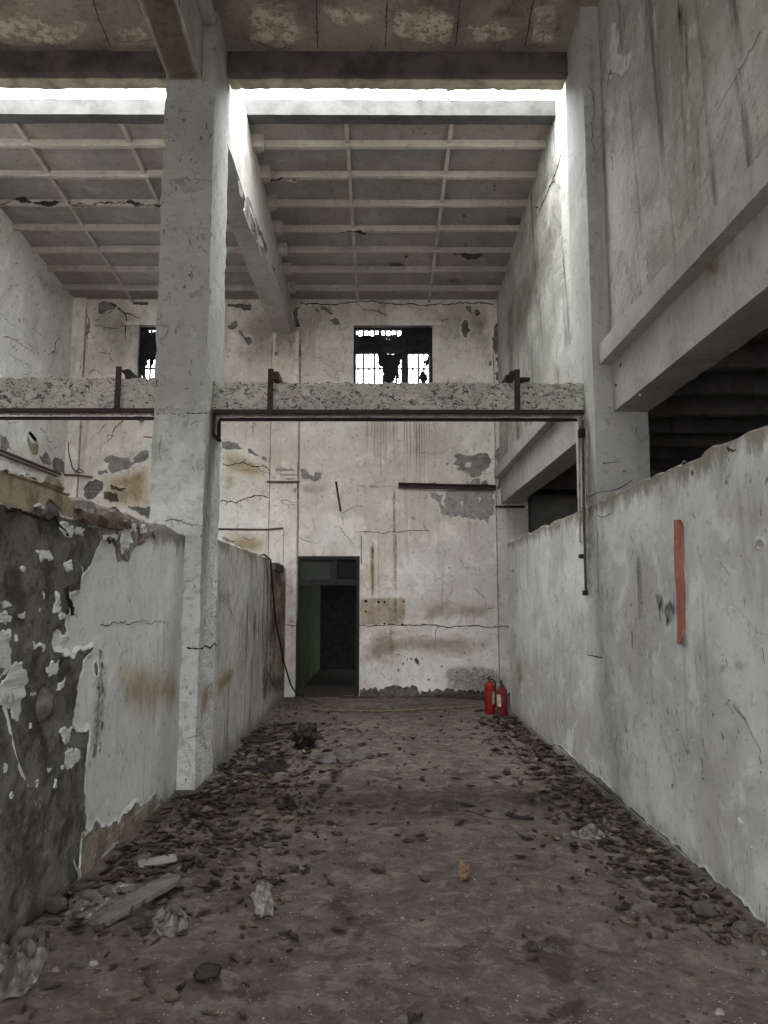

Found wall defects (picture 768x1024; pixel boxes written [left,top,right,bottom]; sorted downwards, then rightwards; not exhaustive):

crack [718,32,760,109]
spalling [0,196,161,209]
spalling [237,177,282,294]
crack [221,459,429,547]
flaking render [428,447,501,525]
crack [101,619,170,627]
crack [359,589,509,651]
flaking render [0,428,173,944]
spalling [359,653,510,696]